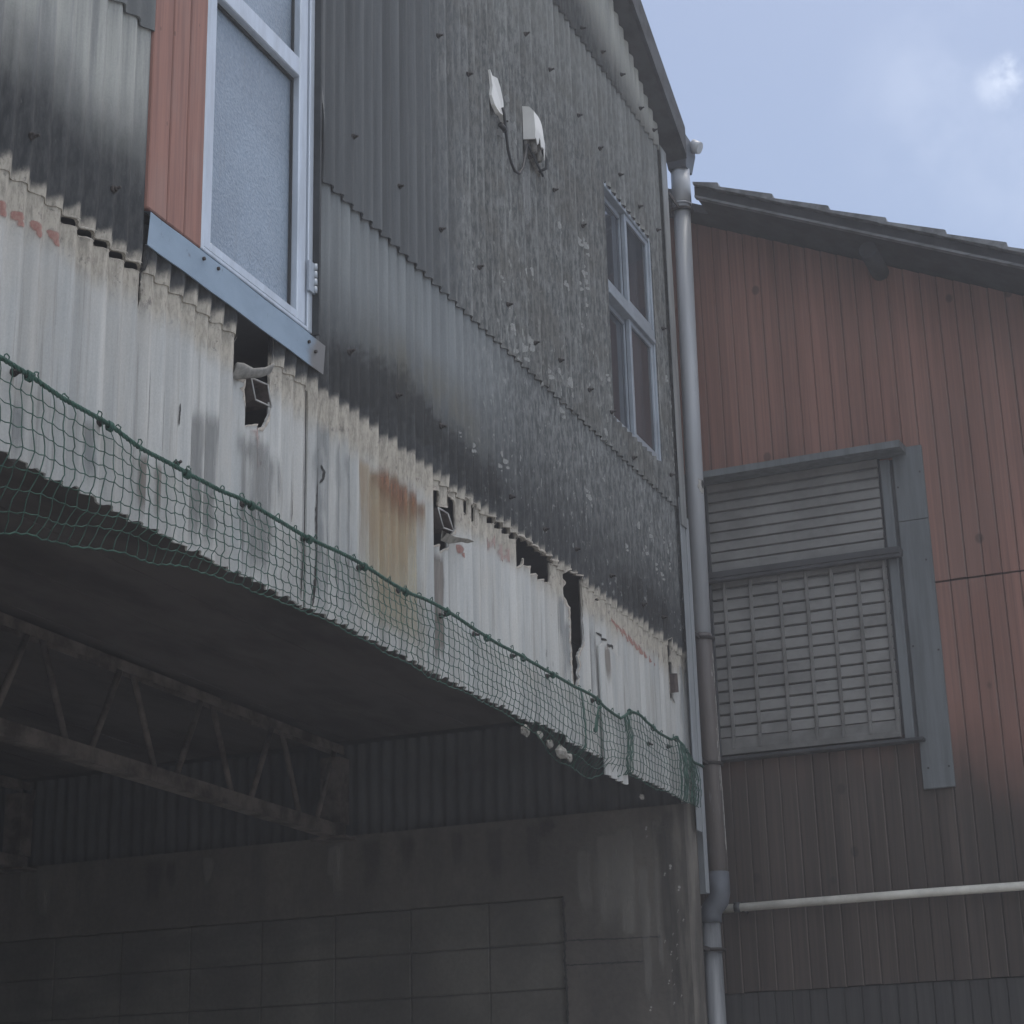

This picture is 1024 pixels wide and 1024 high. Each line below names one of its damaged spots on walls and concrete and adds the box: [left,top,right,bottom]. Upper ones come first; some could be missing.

spalling [233,361,271,431]
damp [189,420,219,528]
damp [242,429,281,557]
corrosion [379,473,417,512]
spalling [516,534,585,690]